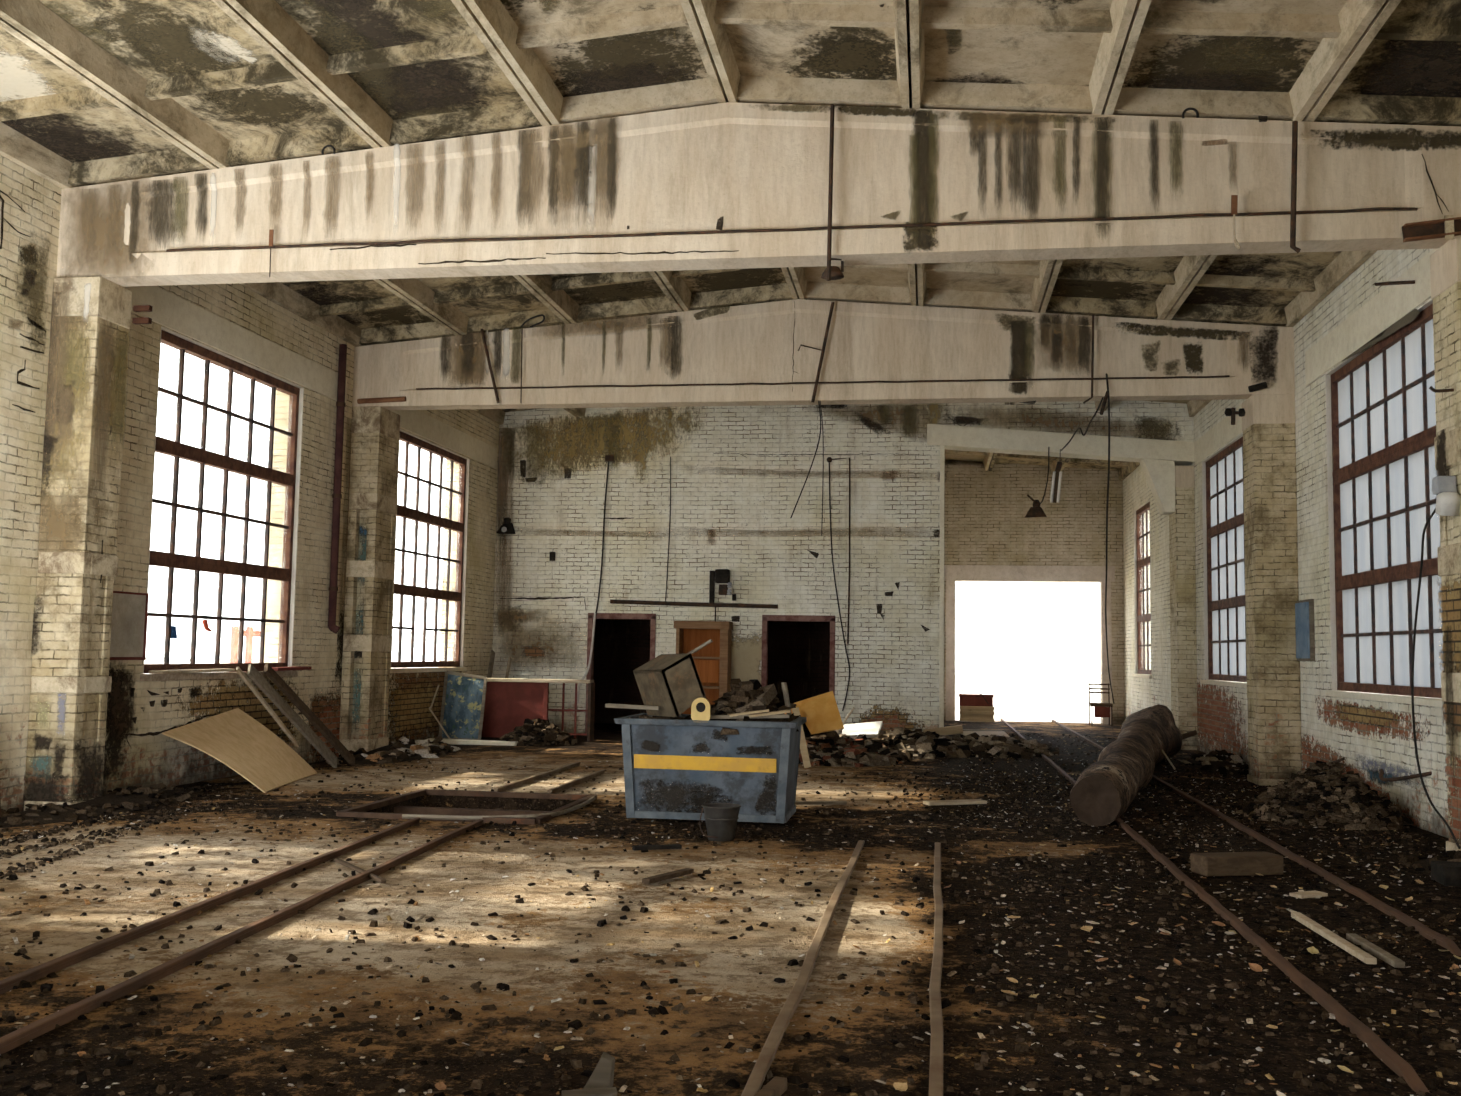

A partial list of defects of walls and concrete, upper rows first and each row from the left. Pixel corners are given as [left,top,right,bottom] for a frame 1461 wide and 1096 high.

damp [551,27,707,97]
damp [1124,35,1319,92]
crack [0,190,31,249]
damp [1,114,158,163]
damp [517,117,616,215]
damp [764,104,1115,253]
damp [1311,128,1461,151]
damp [10,174,217,552]
damp [816,314,1179,440]
damp [1117,322,1279,385]
peeling [1437,580,1461,673]
peeling [1301,697,1461,839]